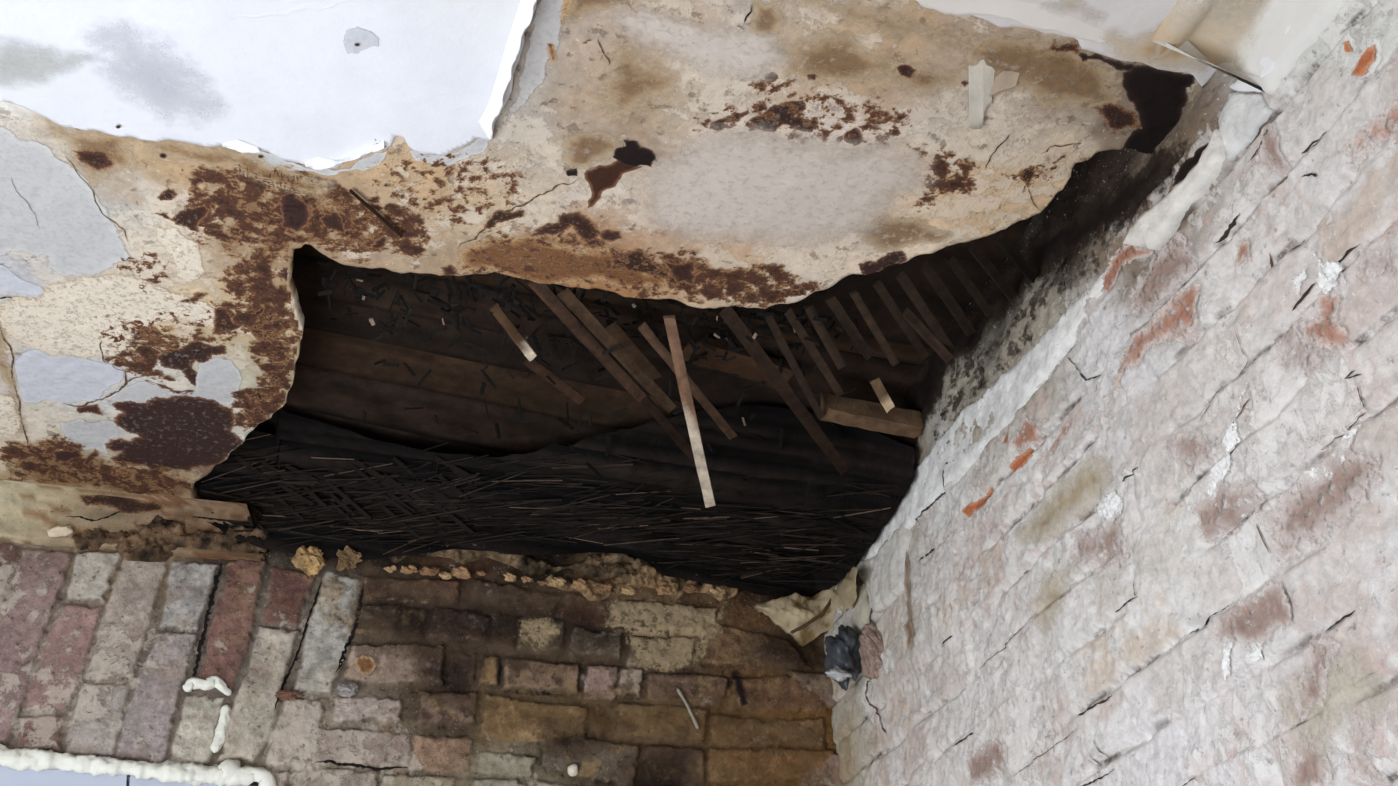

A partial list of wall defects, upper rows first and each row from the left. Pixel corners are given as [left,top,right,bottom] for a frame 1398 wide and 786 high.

water stain [48,120,333,268]
flaking render [0,0,1202,499]
water stain [856,214,952,251]
crack [1215,215,1239,243]
crack [1301,132,1326,177]
crack [1292,245,1358,311]
mould [933,212,1134,453]
water stain [0,325,201,499]
flaking render [47,525,73,537]
flaking render [853,523,912,629]
spalling [962,488,994,517]
crack [1015,695,1113,786]